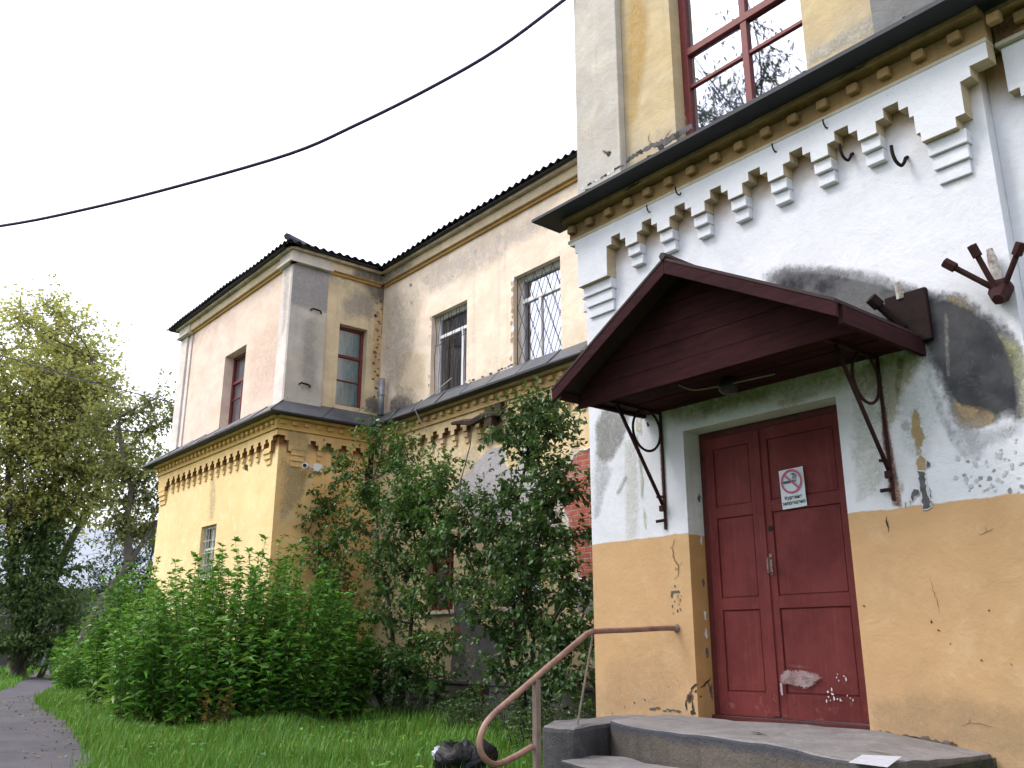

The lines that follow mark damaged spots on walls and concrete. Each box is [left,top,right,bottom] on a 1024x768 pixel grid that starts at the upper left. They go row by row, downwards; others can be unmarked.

leakage [768,267,912,320]
leakage [675,294,1024,453]
leakage [595,410,641,512]
peeling [903,408,934,510]
peeling [953,425,1024,494]
spalling [611,679,713,715]